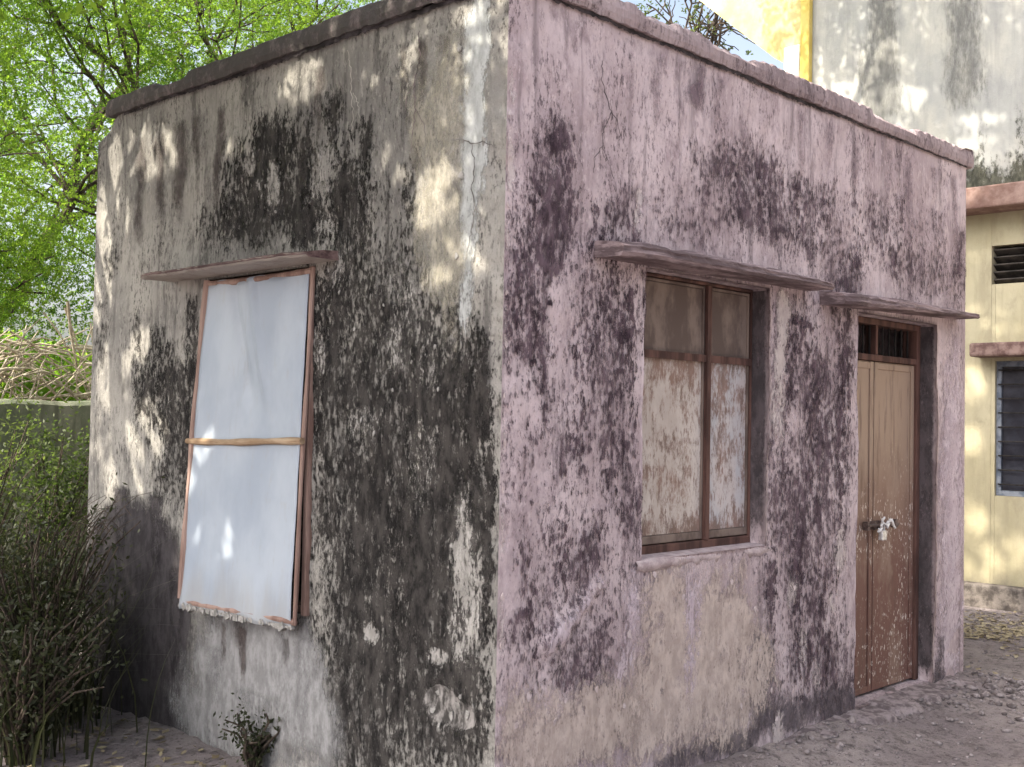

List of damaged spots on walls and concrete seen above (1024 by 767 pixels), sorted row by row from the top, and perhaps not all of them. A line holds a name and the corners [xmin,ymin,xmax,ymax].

damp [690,68,705,106]
crack [553,0,967,178]
crack [451,138,496,250]
damp [642,134,967,299]
damp [83,41,649,767]
damp [654,291,866,767]